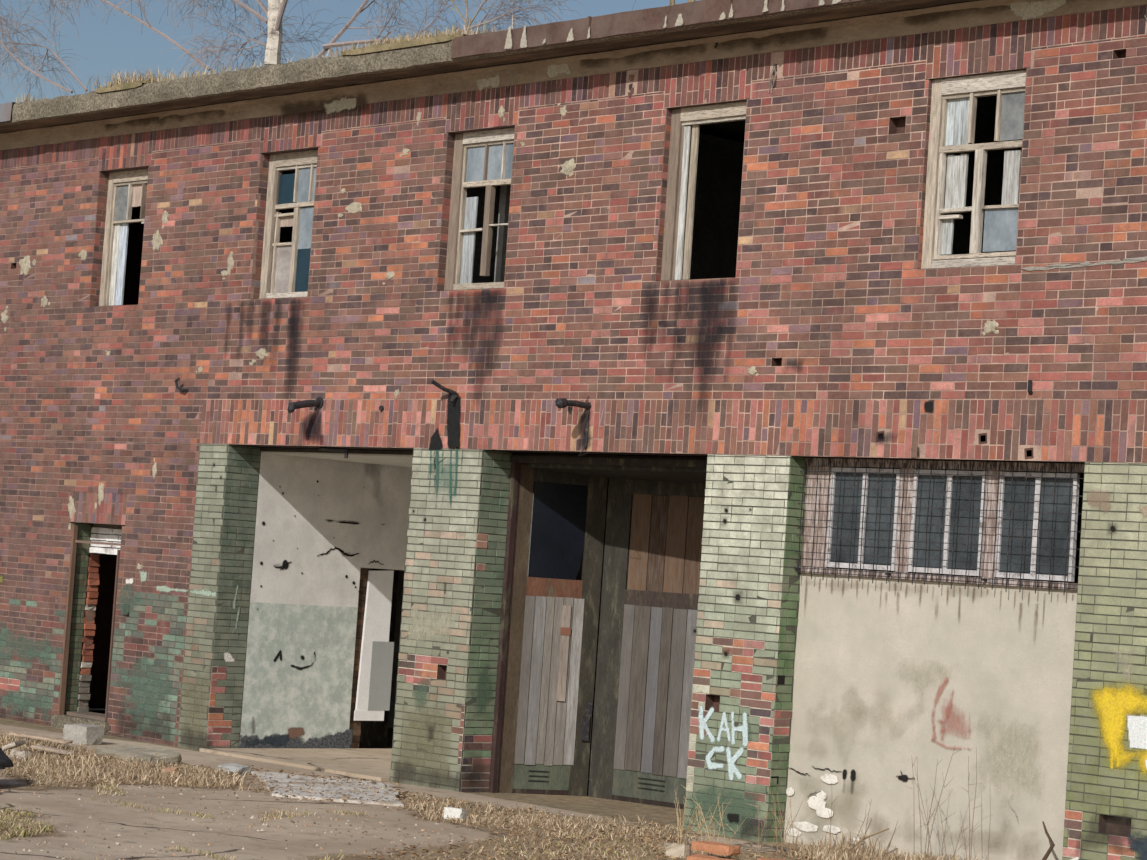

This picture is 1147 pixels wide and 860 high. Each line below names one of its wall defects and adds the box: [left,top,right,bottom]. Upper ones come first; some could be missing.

peeling [504,24,527,49]
water stain [303,415,321,440]
peeling [686,637,794,803]
flaking render [786,769,863,845]